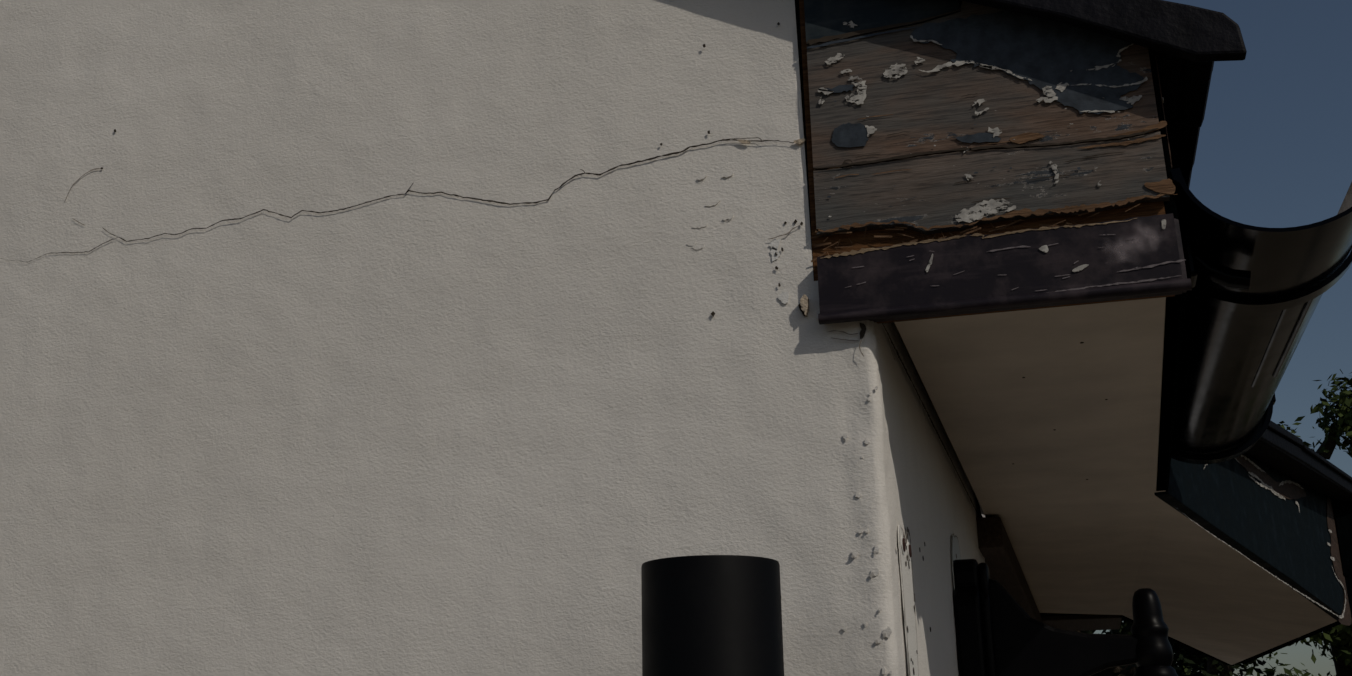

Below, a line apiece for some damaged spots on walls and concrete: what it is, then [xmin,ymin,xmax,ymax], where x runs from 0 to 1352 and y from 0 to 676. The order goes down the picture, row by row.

peeling [806,8,1167,186]
crack [1,137,805,262]
peeling [955,197,1016,223]
peeling [1144,179,1175,194]
peeling [769,219,820,319]
peeling [1234,455,1306,512]
peeling [1175,497,1352,626]